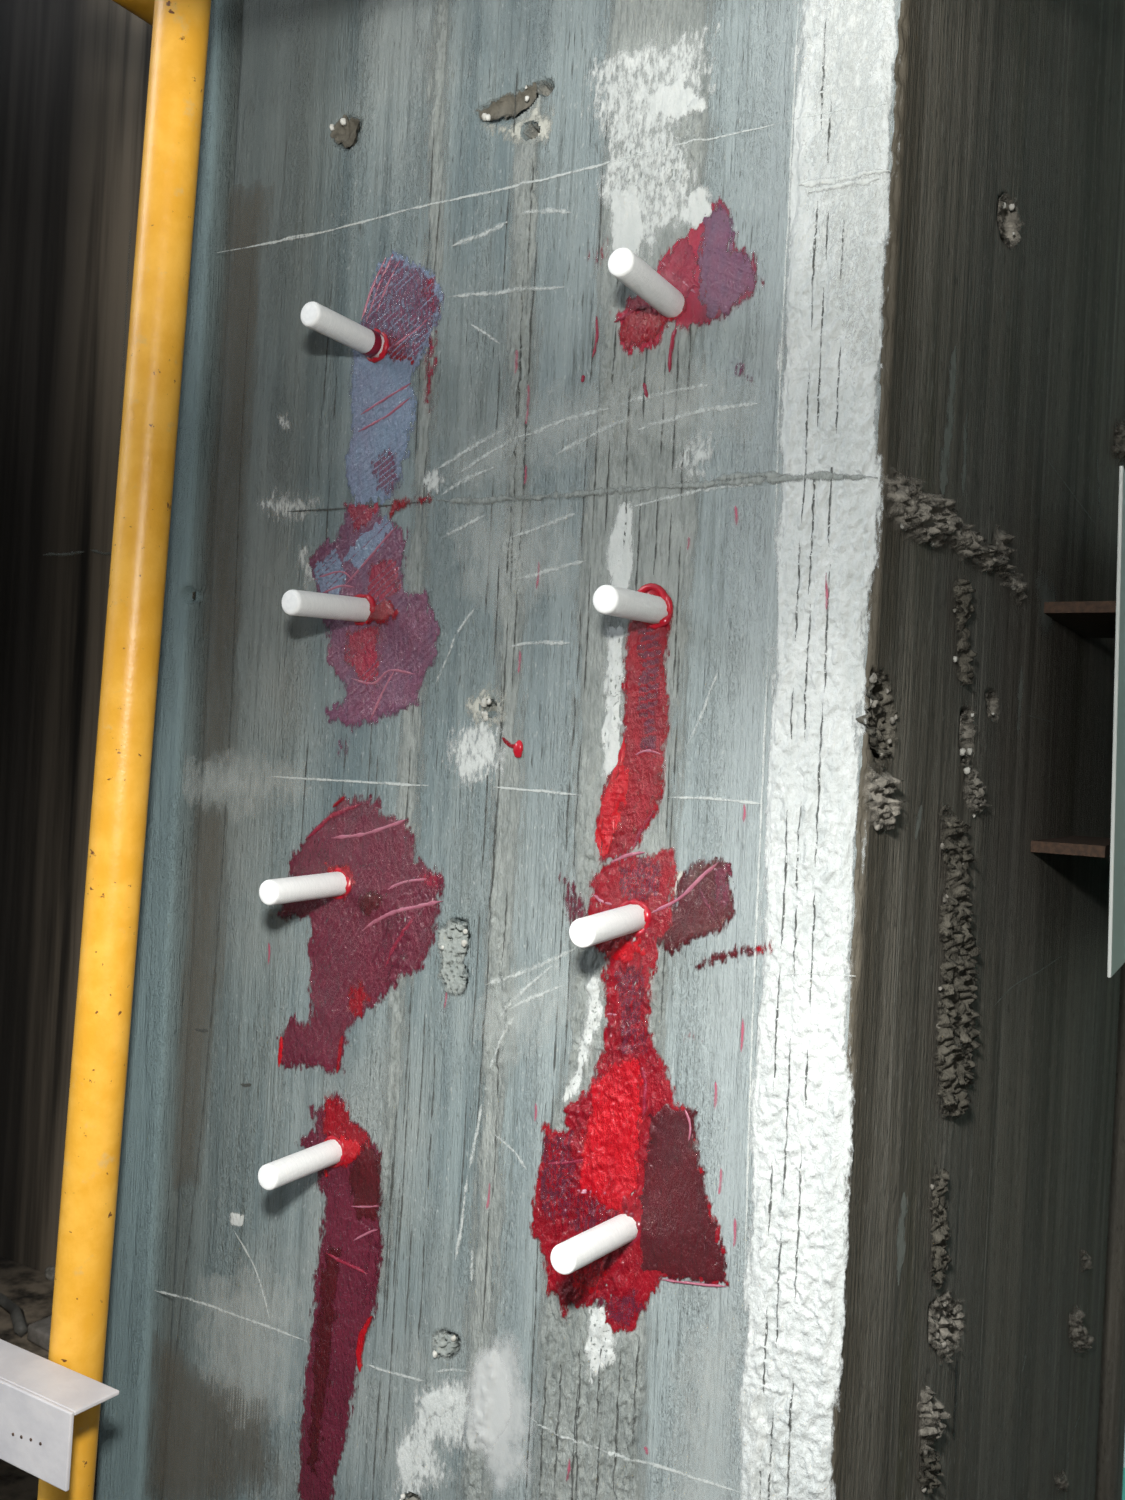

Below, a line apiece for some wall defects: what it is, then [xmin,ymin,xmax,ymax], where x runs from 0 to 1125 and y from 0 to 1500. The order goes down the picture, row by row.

spalling [856,669,906,831]
spalling [934,575,999,1119]
spalling [437,920,471,996]
spalling [927,1169,965,1363]
water stain [392,1350,522,1499]
spalling [917,1386,951,1494]